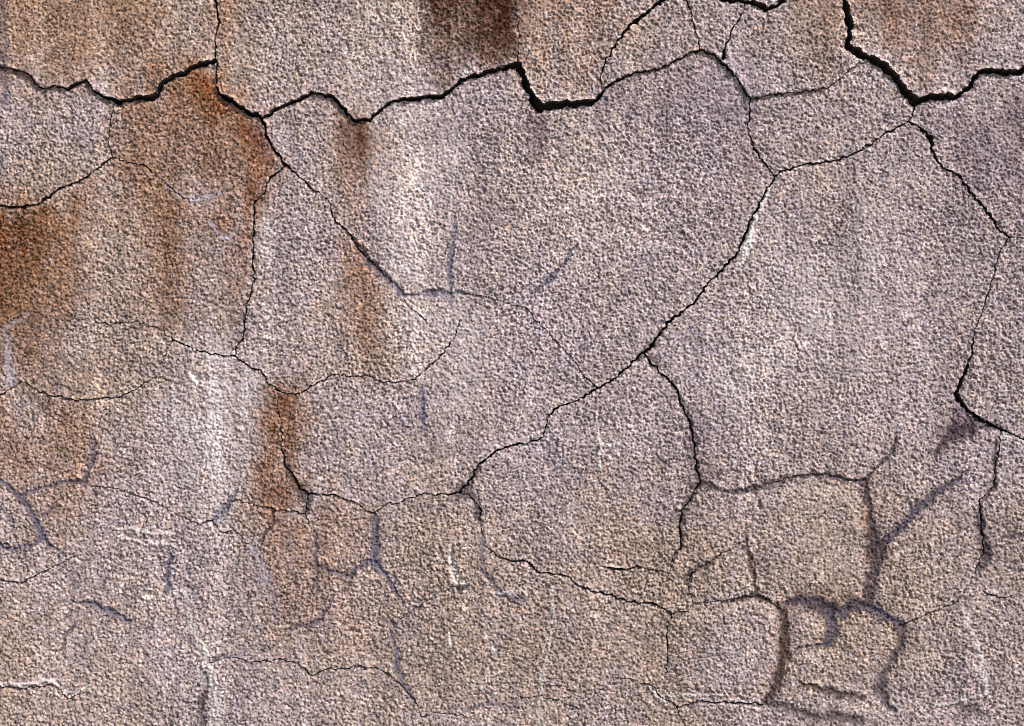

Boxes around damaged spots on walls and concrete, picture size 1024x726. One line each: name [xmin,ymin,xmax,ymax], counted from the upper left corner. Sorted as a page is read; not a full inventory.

crack [0,0,1024,574]
crack [0,555,77,583]
crack [398,586,454,622]
crack [485,541,783,672]
crack [902,576,974,626]
crack [0,684,86,699]
crack [209,657,467,717]
crack [511,677,763,724]